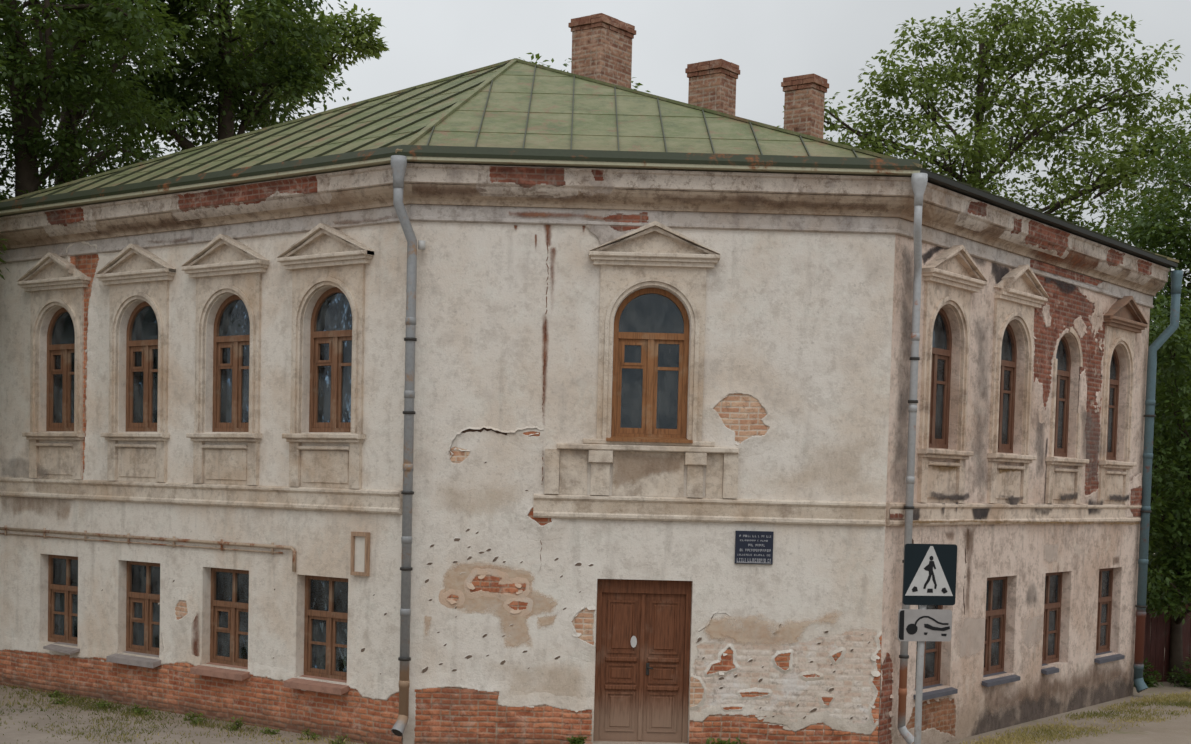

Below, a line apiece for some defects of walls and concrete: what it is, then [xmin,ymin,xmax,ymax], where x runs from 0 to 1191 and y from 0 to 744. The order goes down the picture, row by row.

flaking render [170,174,332,221]
flaking render [475,166,662,246]
flaking render [954,196,994,232]
flaking render [999,213,1156,504]
flaking render [505,416,554,454]
flaking render [702,379,783,459]
flaking render [158,580,198,633]
peeling [428,528,596,665]
flaking render [0,636,594,744]
peeling [689,614,962,744]